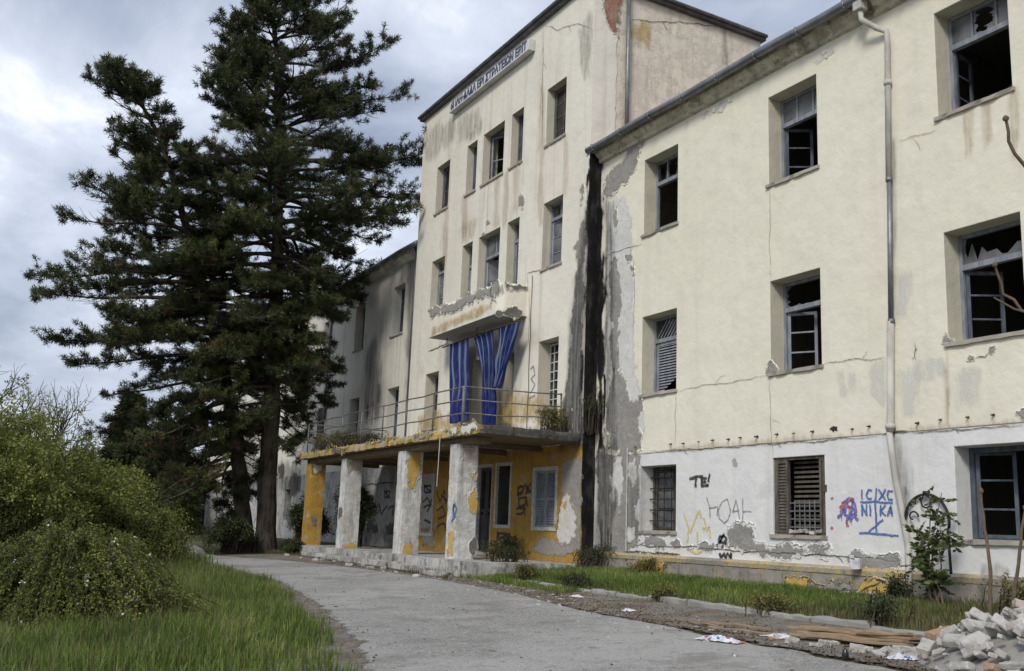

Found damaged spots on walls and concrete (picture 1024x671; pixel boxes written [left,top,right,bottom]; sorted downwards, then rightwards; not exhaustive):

spalling [602,0,622,38]
crack [631,19,717,29]
spalling [429,279,527,321]
leakage [482,153,613,564]
peeling [496,140,833,573]
peeling [405,452,423,492]
peeling [413,413,479,515]
spalling [468,537,479,556]